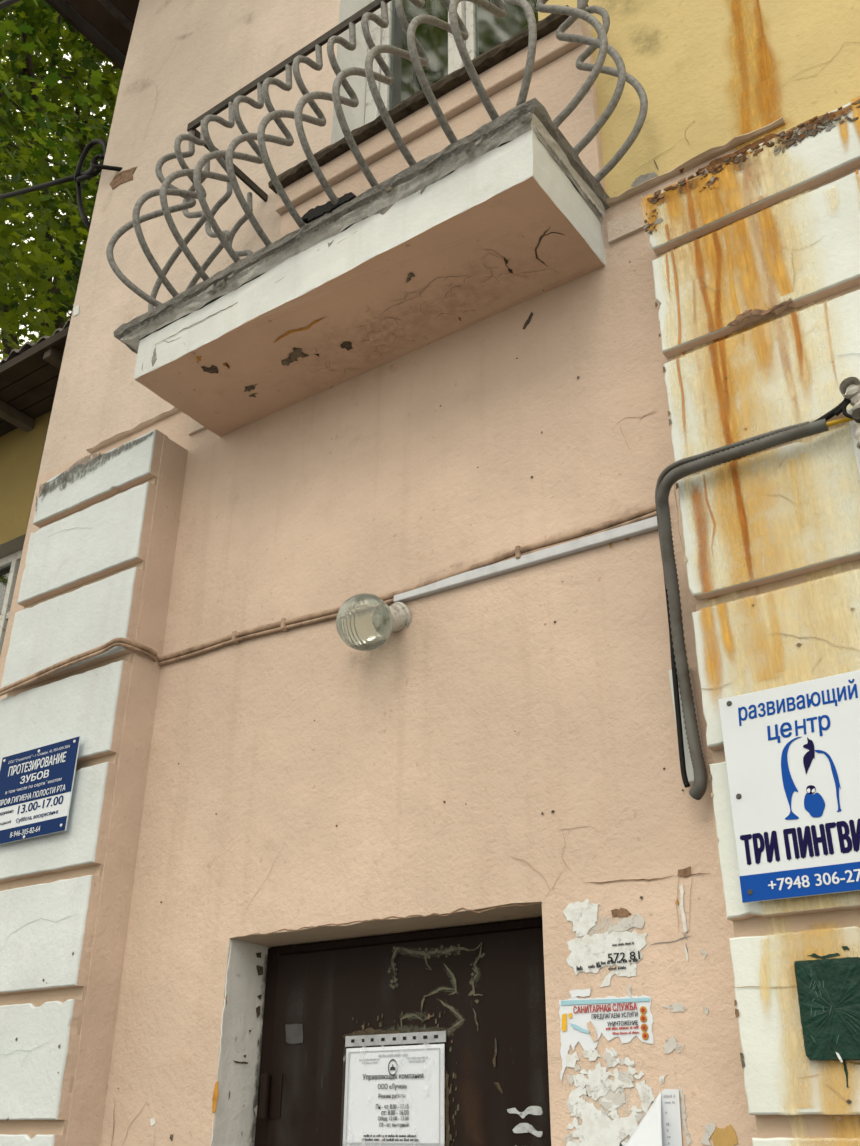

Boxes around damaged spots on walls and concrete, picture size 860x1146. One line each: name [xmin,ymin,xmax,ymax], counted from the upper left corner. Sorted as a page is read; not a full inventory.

spalling [631,99,860,234]
corrosion [643,0,860,457]
spalling [727,298,793,326]
peeling [196,356,230,374]
peeling [281,348,320,366]
corrosion [684,403,860,692]
crack [504,826,594,896]
corrosion [763,894,833,935]
corrosion [803,923,832,960]
corrosion [761,957,797,1007]
corrosion [828,1060,860,1146]
peeling [701,1125,738,1146]